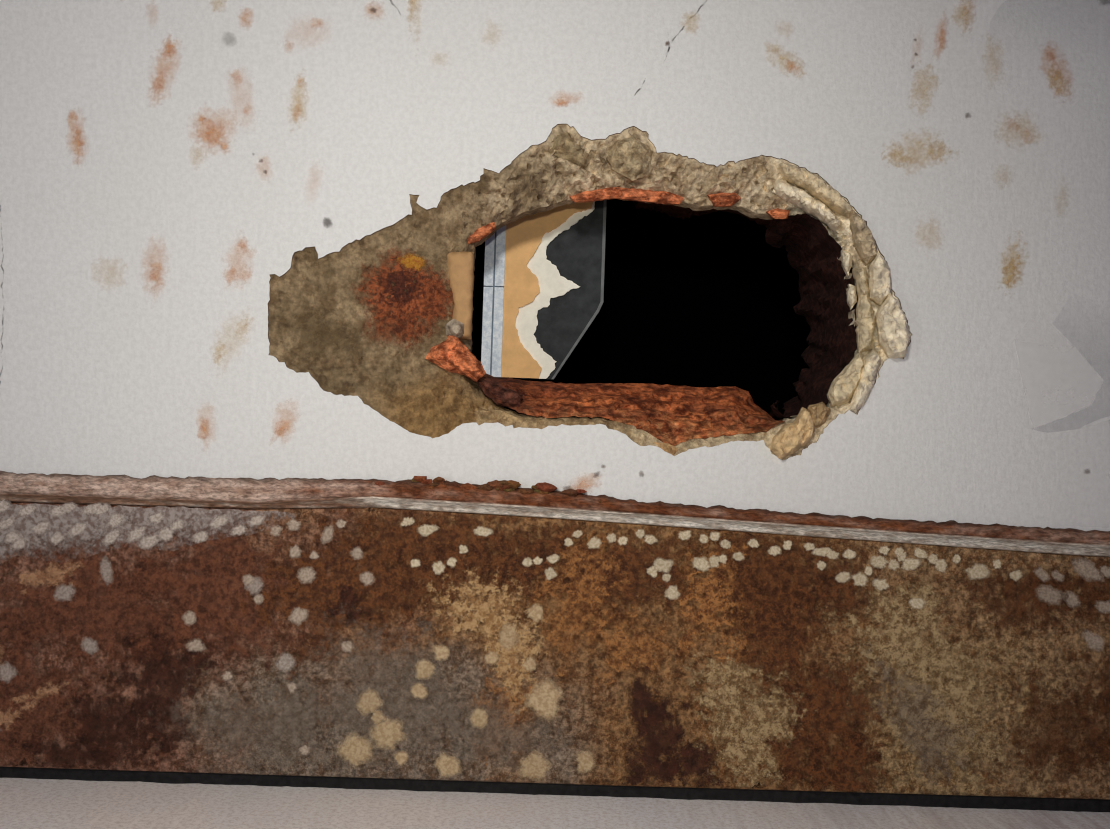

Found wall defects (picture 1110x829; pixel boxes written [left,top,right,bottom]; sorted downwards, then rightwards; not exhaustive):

rust [357,248,454,347]
spalling [268,124,911,460]
rust [0,508,902,792]
leakage [829,571,1025,791]
rust [958,556,1110,640]